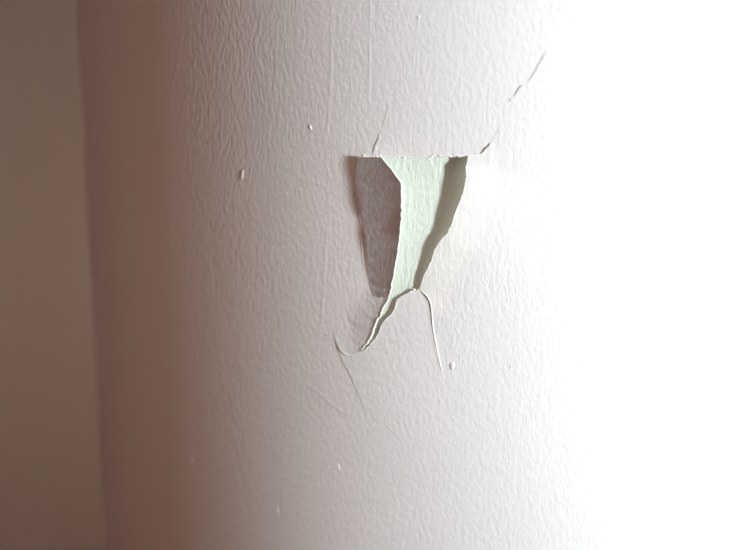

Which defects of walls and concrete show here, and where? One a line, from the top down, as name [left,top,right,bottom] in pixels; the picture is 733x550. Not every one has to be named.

flaking render [362,156,468,351]